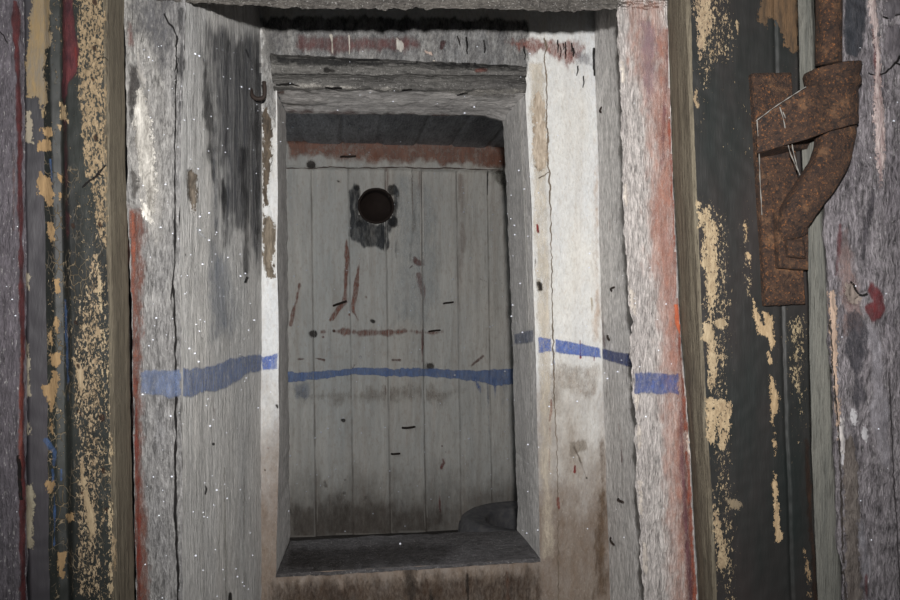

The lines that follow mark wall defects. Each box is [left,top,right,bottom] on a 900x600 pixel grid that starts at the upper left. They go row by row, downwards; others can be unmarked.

peeling [24,0,117,599]
crack [164,13,180,600]
peeling [695,200,776,600]
peeling [768,375,781,456]
spalling [787,316,806,412]
peeling [771,471,784,543]
spalling [803,445,818,600]